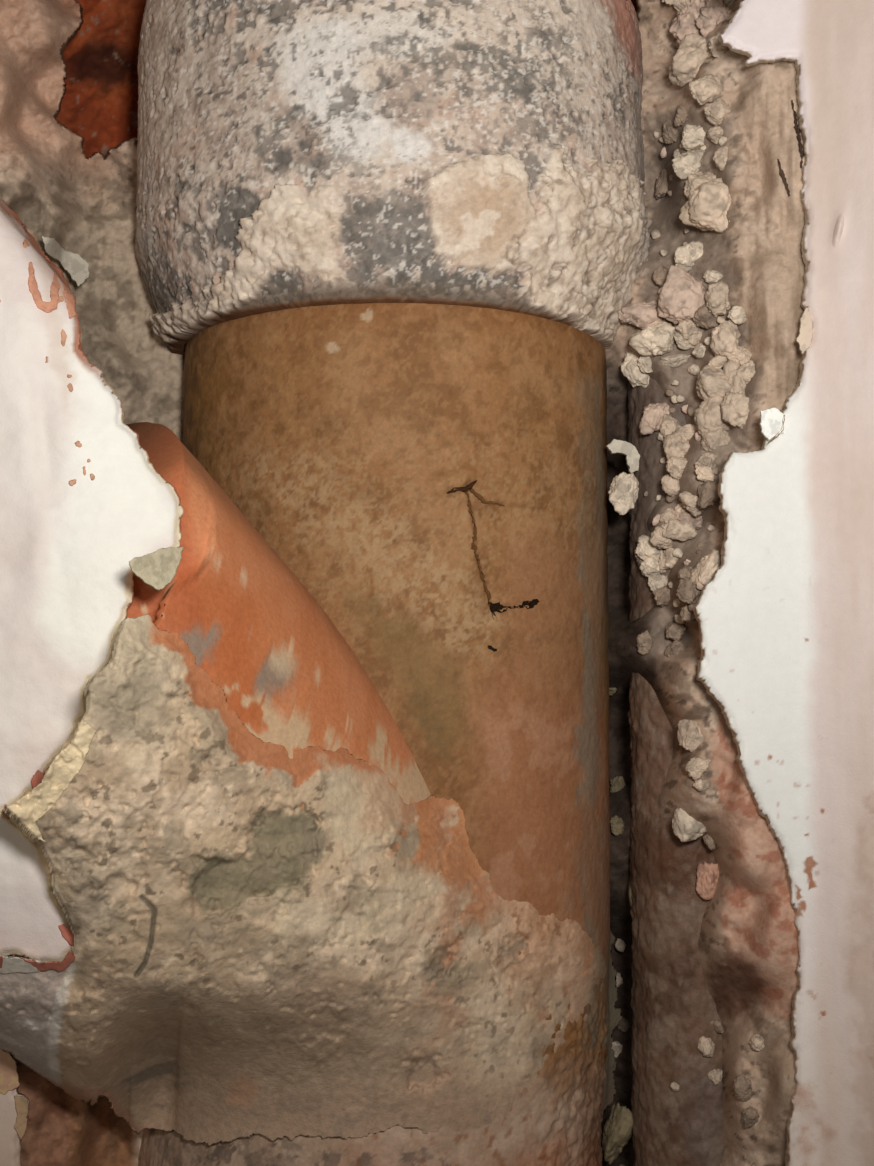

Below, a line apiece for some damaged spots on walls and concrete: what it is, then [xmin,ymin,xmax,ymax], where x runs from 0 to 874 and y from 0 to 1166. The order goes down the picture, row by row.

flaking render [56,0,146,159]
flaking render [41,236,90,287]
flaking render [796,307,813,354]
peeling [0,1049,29,1139]